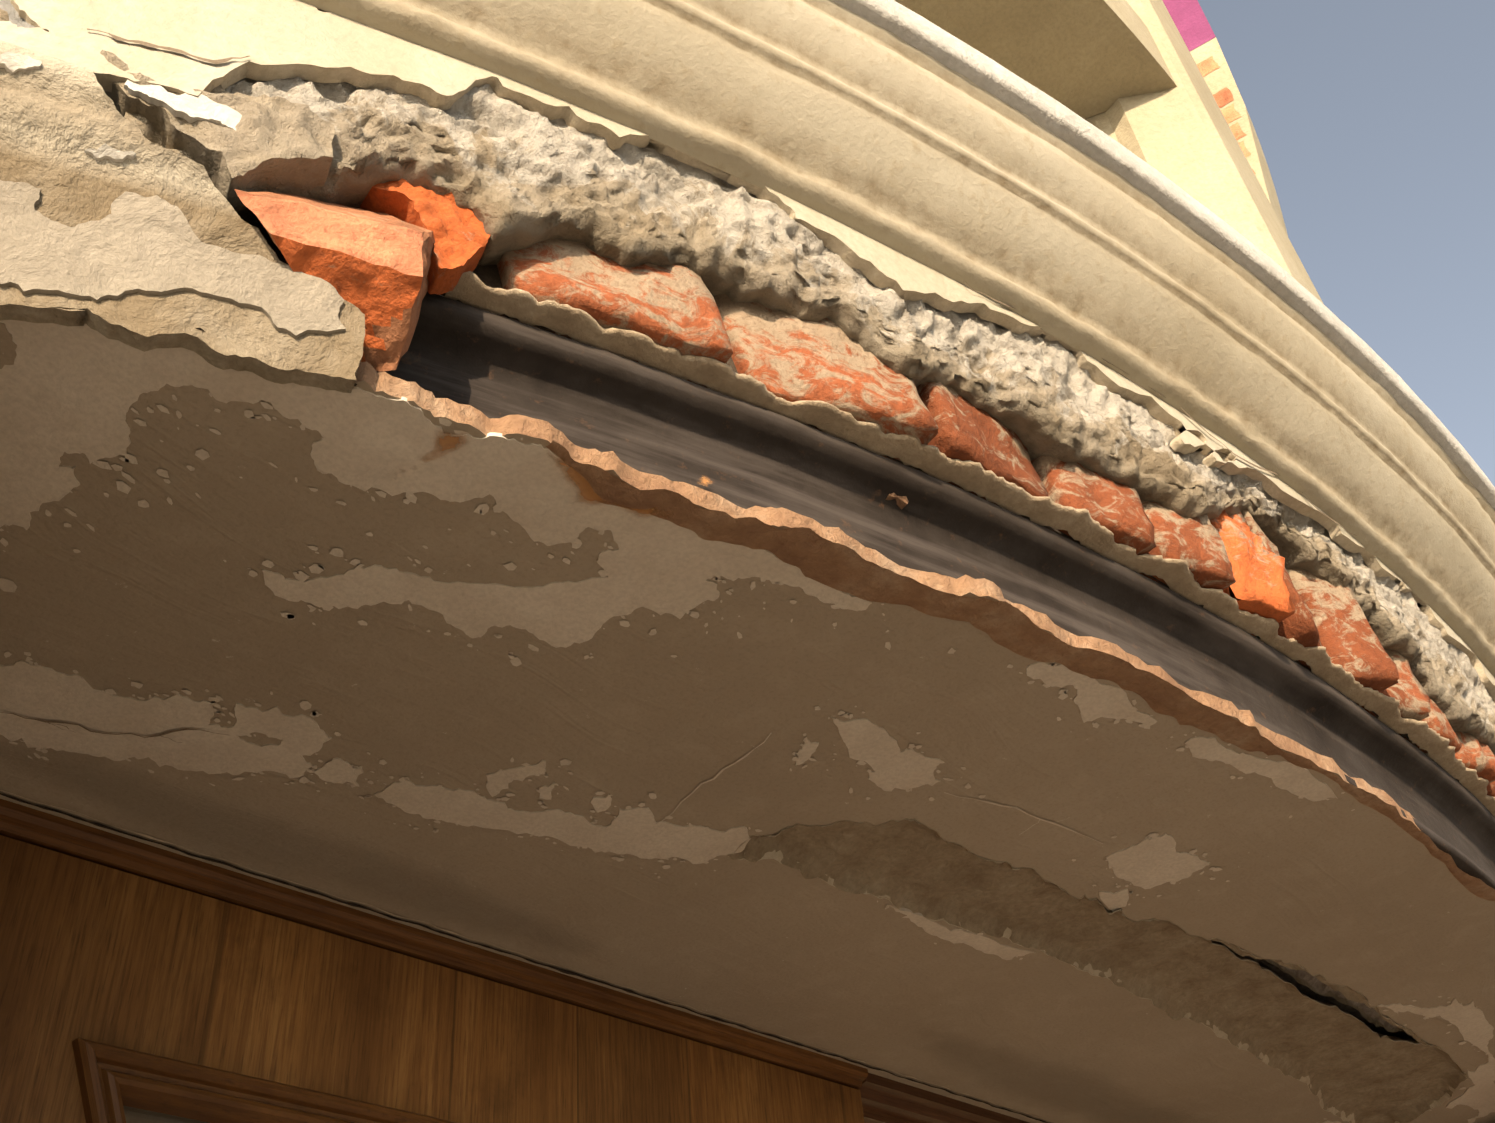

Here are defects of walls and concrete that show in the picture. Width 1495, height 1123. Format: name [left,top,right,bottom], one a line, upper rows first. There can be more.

spalling [0,0,35,28]
spalling [0,43,1495,901]
spalling [0,652,1495,1123]